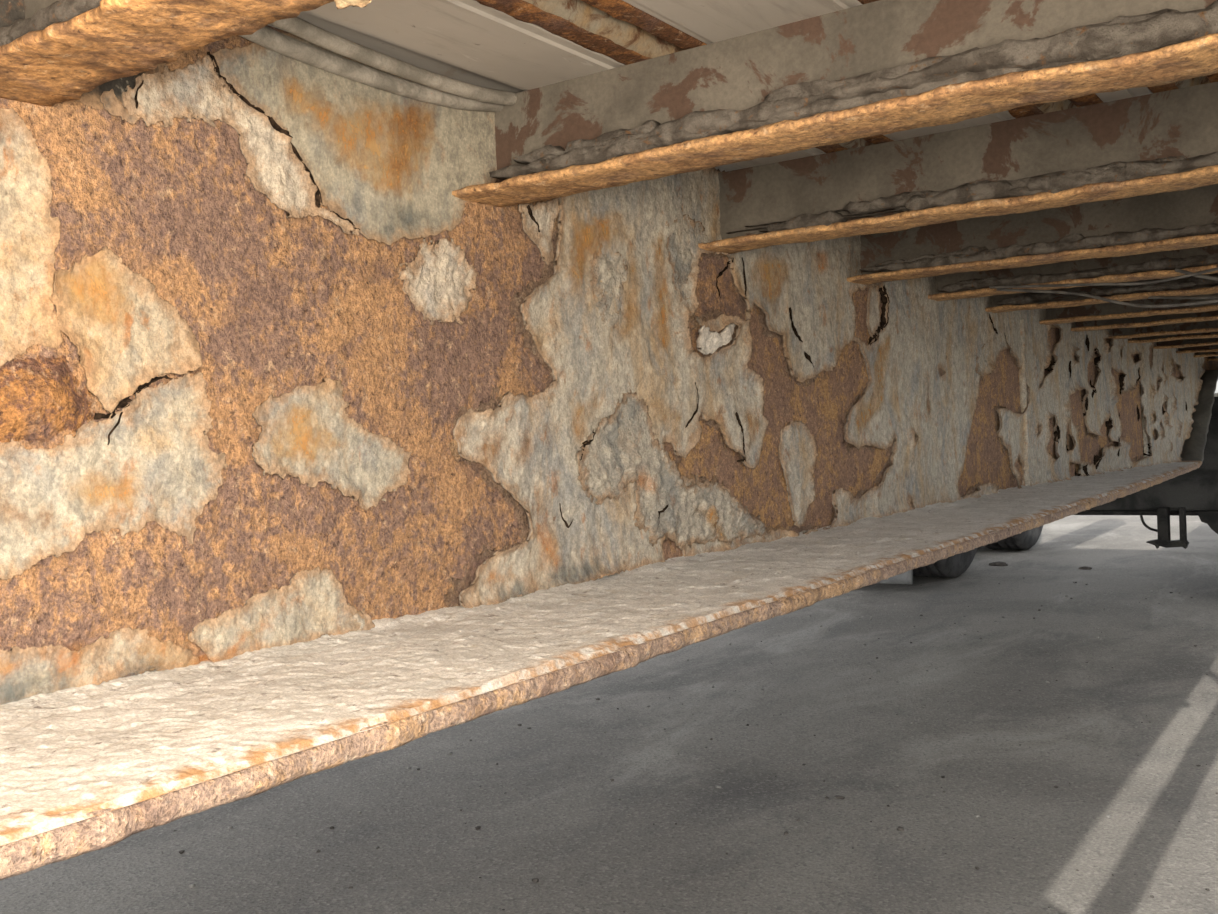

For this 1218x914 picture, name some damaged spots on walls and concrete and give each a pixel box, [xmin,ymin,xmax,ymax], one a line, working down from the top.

crack [207,51,360,230]
peeling [72,43,497,325]
rust [489,0,1218,180]
rust [727,152,1218,234]
peeling [0,107,228,580]
crack [94,373,175,445]
rust [0,83,552,669]
crack [735,412,746,462]
crack [789,307,814,367]
peeling [443,167,1205,608]
rust [664,219,1218,528]
peeling [0,567,375,704]